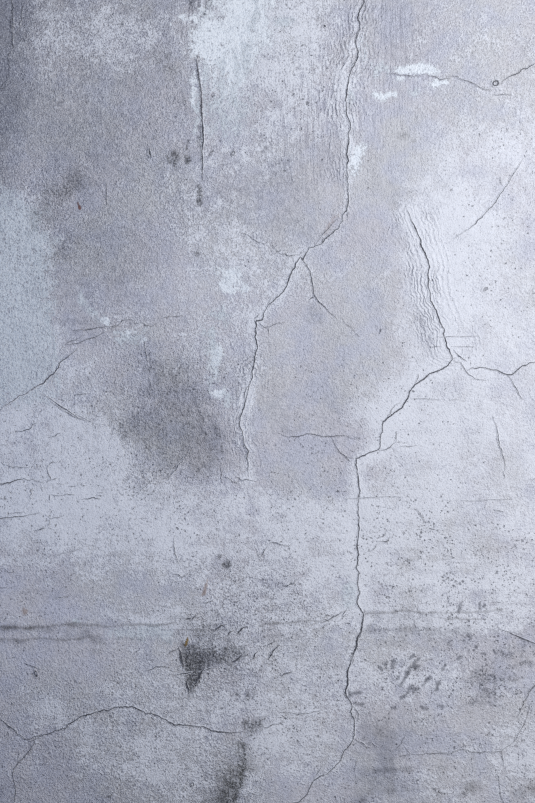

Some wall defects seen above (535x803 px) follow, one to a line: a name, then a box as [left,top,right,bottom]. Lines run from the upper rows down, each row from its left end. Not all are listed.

crack [390,63,535,96]
crack [220,0,367,484]
crack [454,156,526,239]
crack [0,315,183,411]
crack [0,416,103,531]
crack [258,541,291,558]
crack [278,210,535,803]
crack [251,639,280,661]
crack [0,705,323,803]